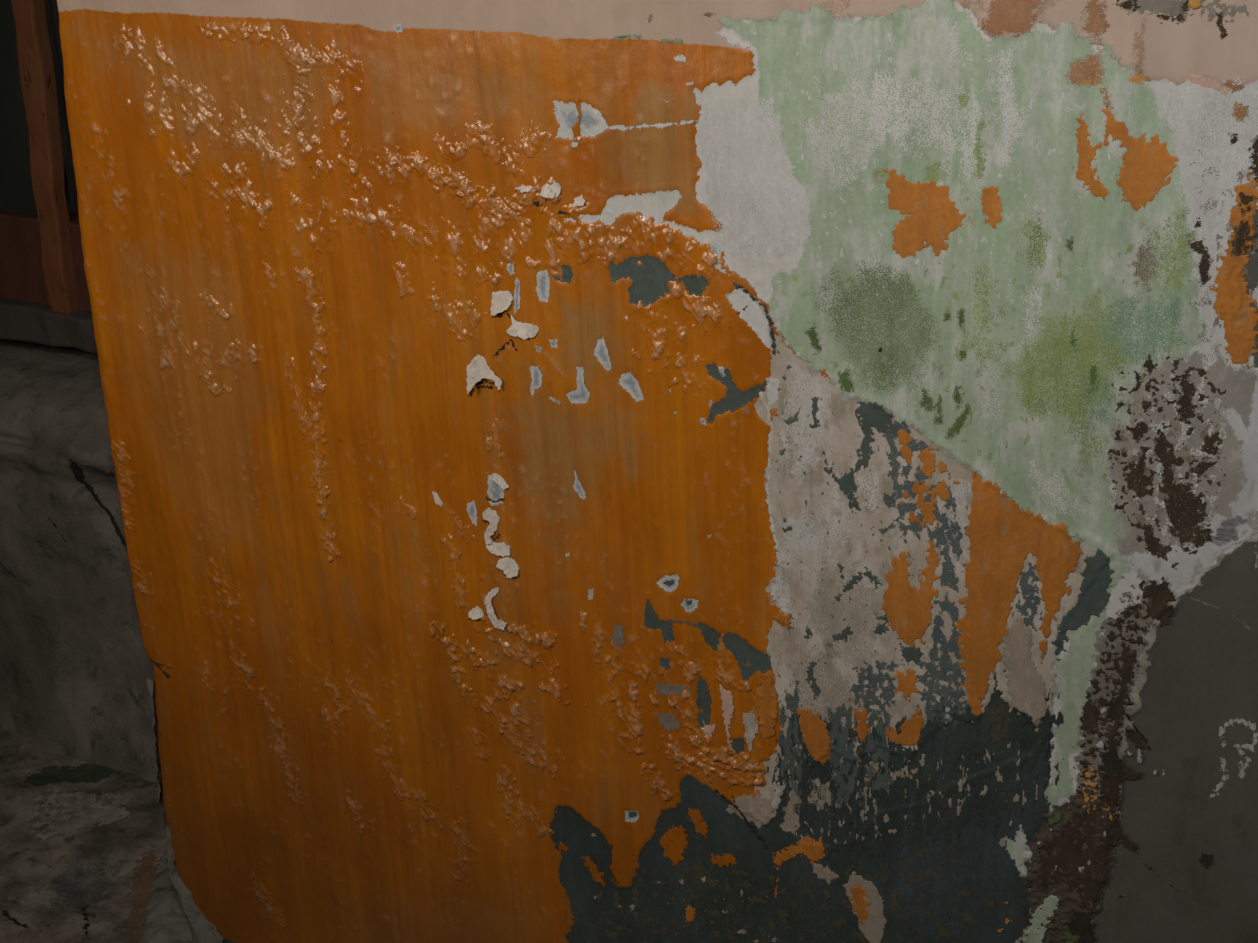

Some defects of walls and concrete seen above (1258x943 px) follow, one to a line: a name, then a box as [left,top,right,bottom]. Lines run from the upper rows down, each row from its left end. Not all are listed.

peeling [466,262,590,405]
damp [804,260,966,403]
crack [68,458,127,550]
peeling [515,0,1258,943]
crack [149,658,172,679]
crack [2,910,28,928]
crack [81,906,90,936]